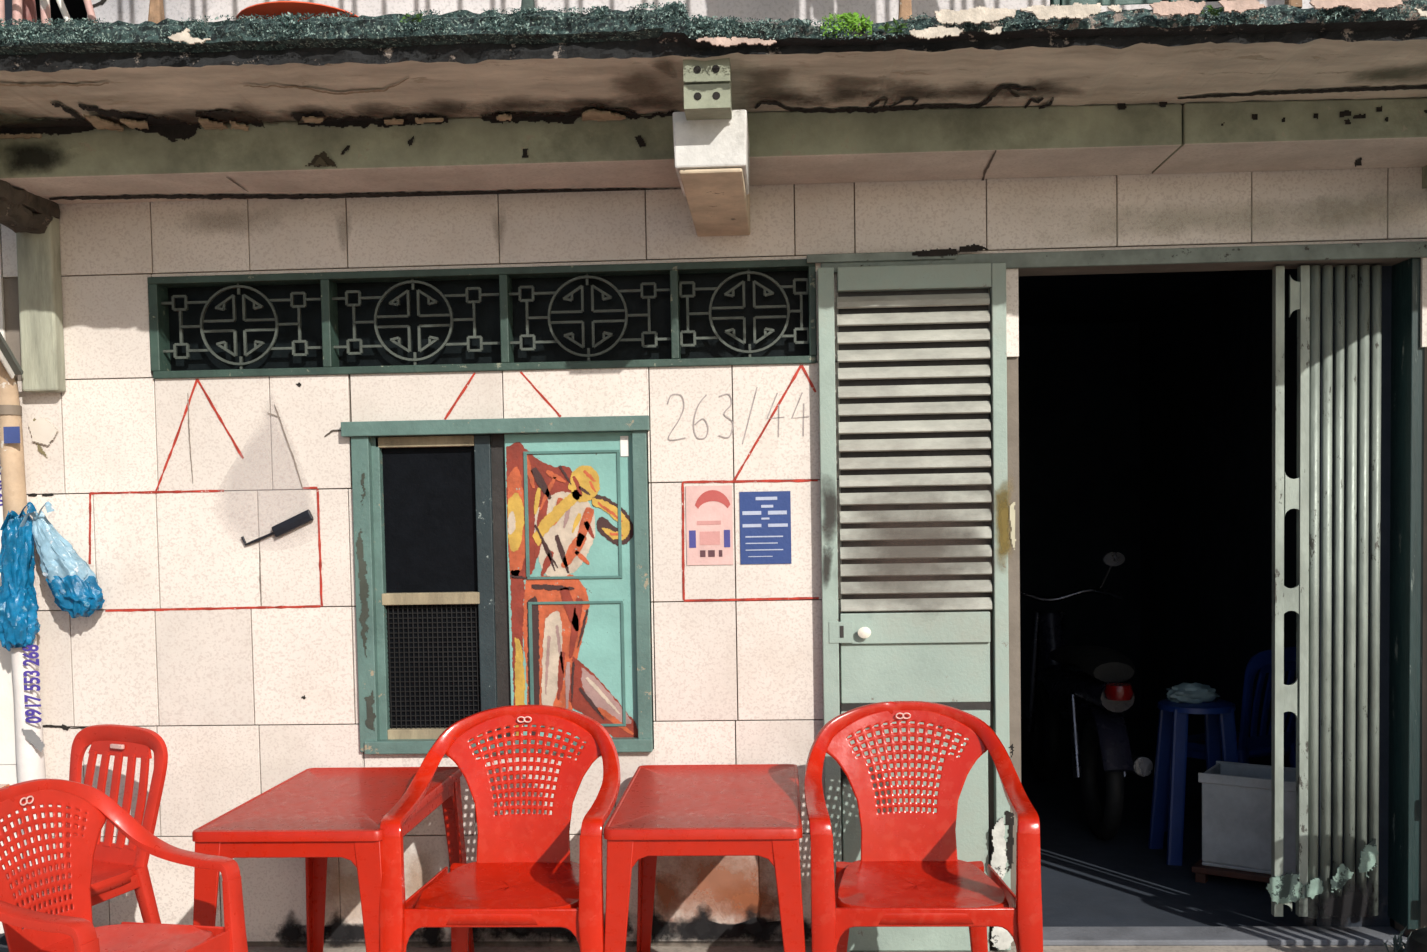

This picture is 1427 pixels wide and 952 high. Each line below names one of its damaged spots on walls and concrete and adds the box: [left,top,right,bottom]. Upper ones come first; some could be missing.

peeling [909,2,1122,40]
peeling [1149,0,1266,17]
peeling [1309,0,1427,18]
peeling [696,36,777,47]
water stain [563,63,671,109]
water stain [832,79,938,101]
water stain [1360,69,1427,80]
spalling [0,102,265,142]
peeling [1266,838,1379,905]
water stain [651,914,668,941]
water stain [688,908,715,940]
water stain [740,909,767,941]